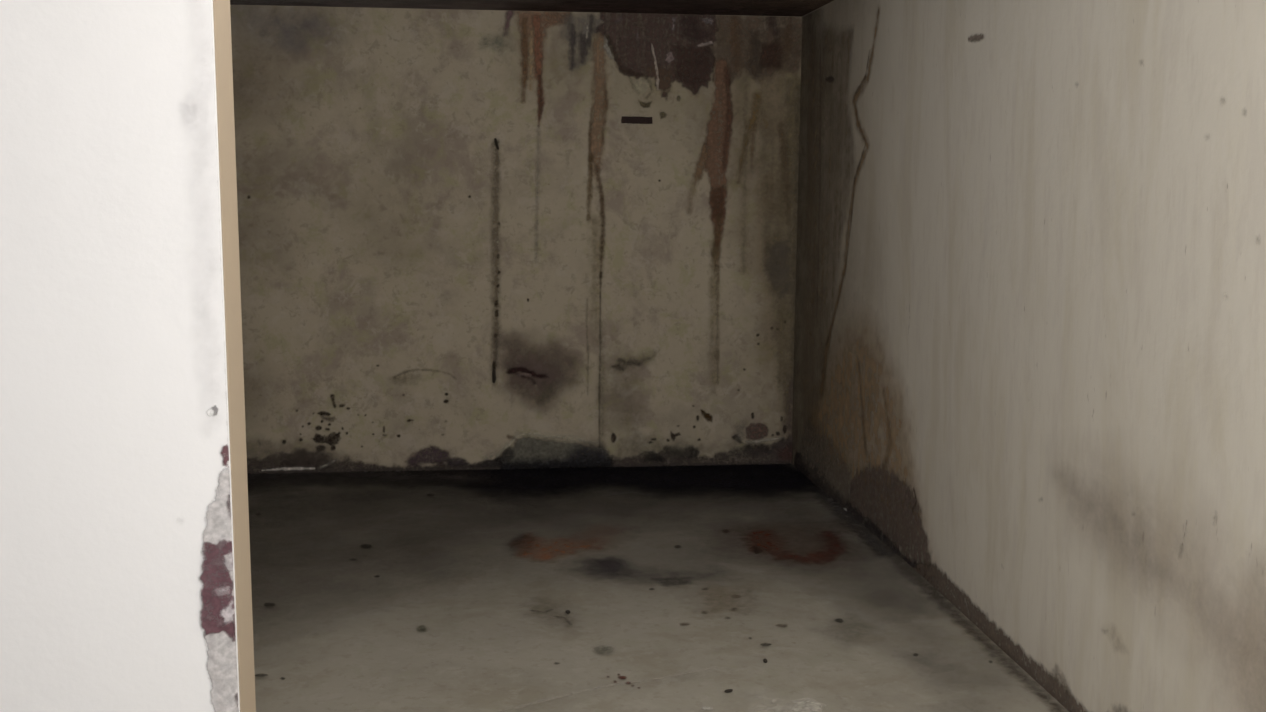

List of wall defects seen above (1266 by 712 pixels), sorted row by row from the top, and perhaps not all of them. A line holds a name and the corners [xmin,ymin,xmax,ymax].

rust [495,11,571,121]
peeling [597,13,718,118]
rust [587,32,607,277]
rust [694,59,761,287]
water stain [262,394,350,471]
water stain [649,405,712,443]
spalling [200,445,239,712]